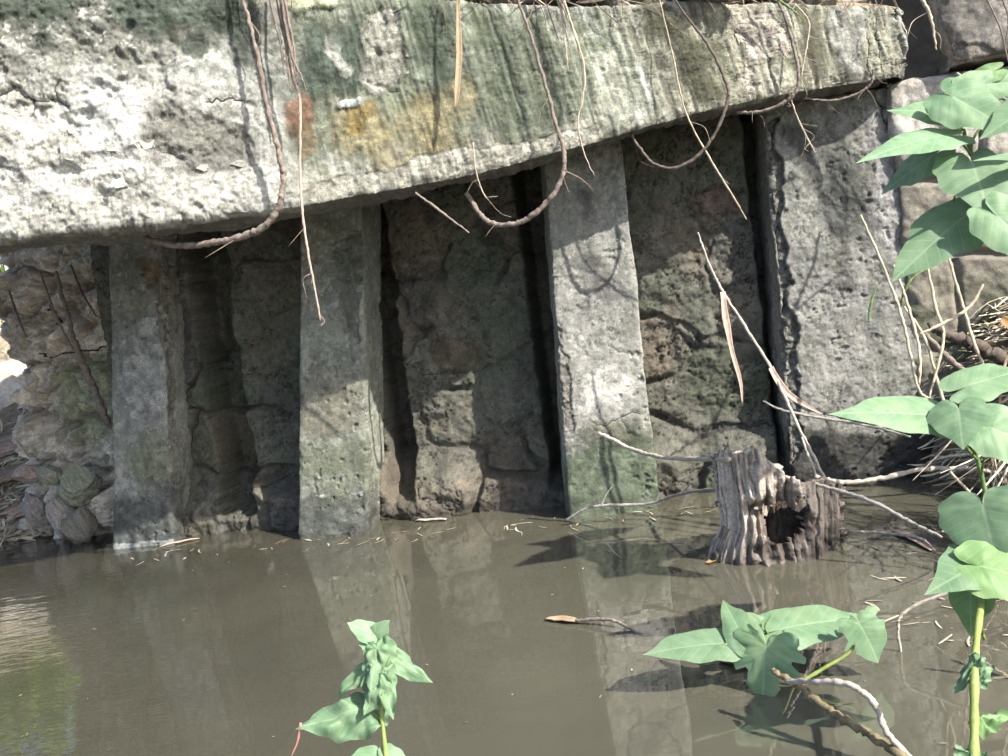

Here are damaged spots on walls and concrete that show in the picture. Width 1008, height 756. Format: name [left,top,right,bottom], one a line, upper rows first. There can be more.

crack [0,80,70,119]
leakage [0,0,86,47]
leakage [68,72,152,155]
leakage [108,0,267,64]
leakage [294,20,366,103]
leakage [587,49,634,130]
leakage [643,2,727,100]
leakage [795,4,869,77]